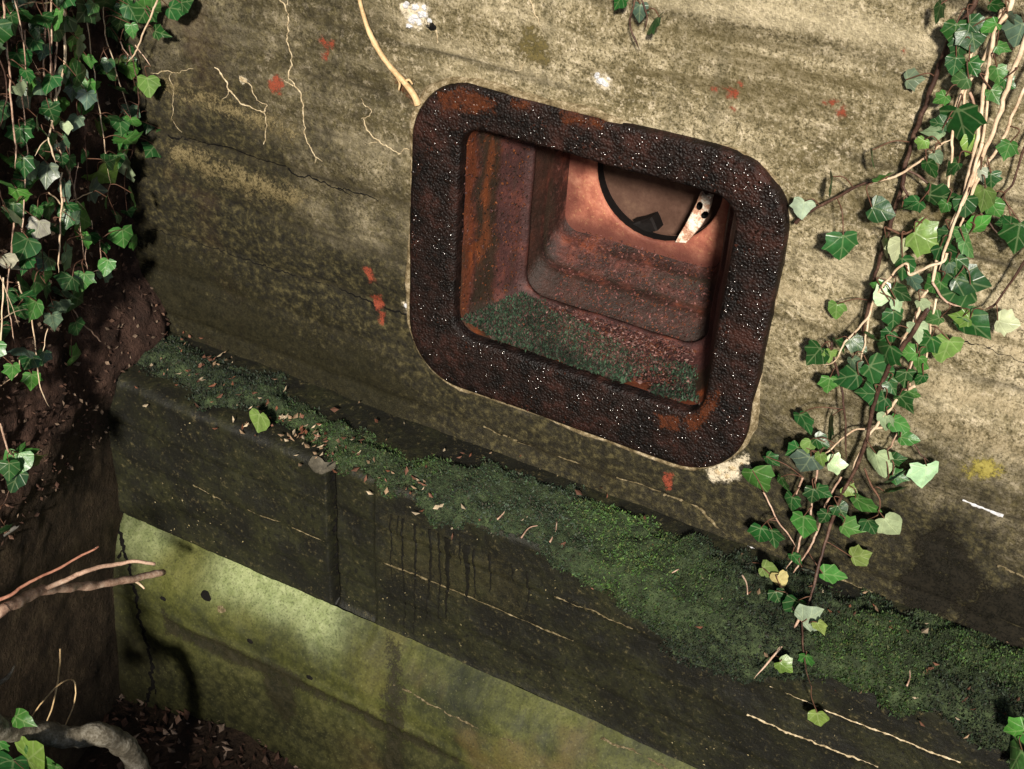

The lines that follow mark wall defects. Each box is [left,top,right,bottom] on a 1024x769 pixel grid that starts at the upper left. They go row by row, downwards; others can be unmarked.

crack [153,0,379,201]
corrosion [372,295,385,325]
crack [117,526,157,706]
water stain [389,514,492,635]